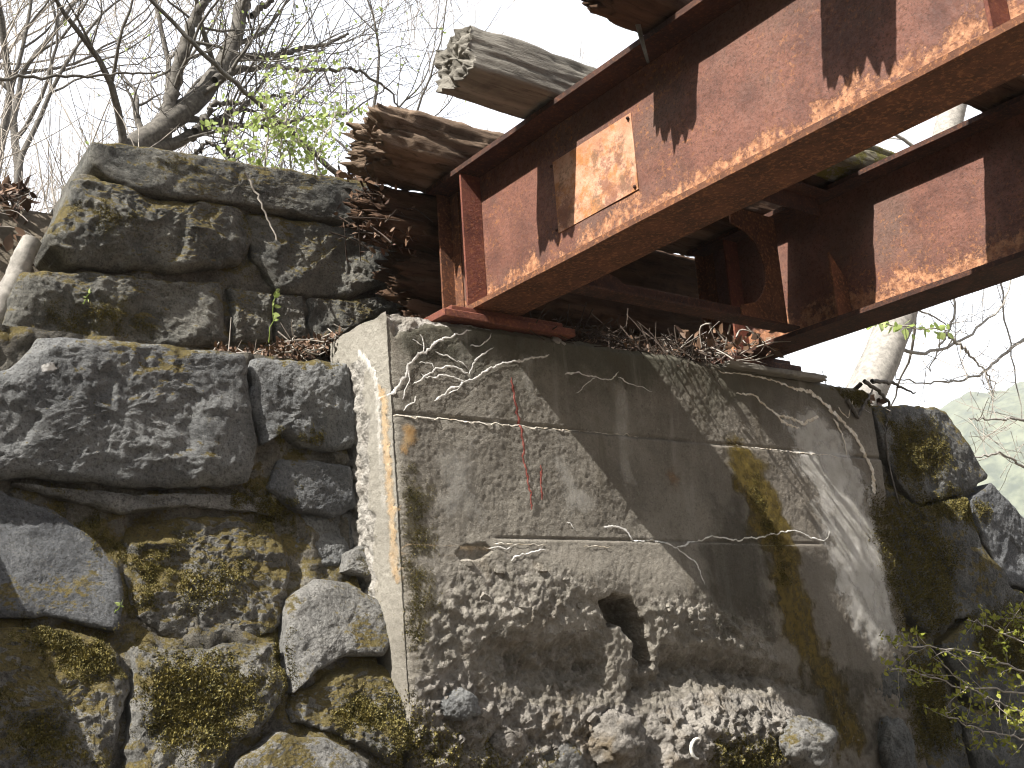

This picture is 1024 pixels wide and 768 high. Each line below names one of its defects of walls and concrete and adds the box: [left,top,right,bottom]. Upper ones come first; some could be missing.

corrosion [357,350,395,538]
crack [379,329,649,437]
crack [725,392,837,458]
crack [484,542,545,561]
crack [566,522,830,584]
leakage [718,370,899,654]
spalling [410,544,807,768]